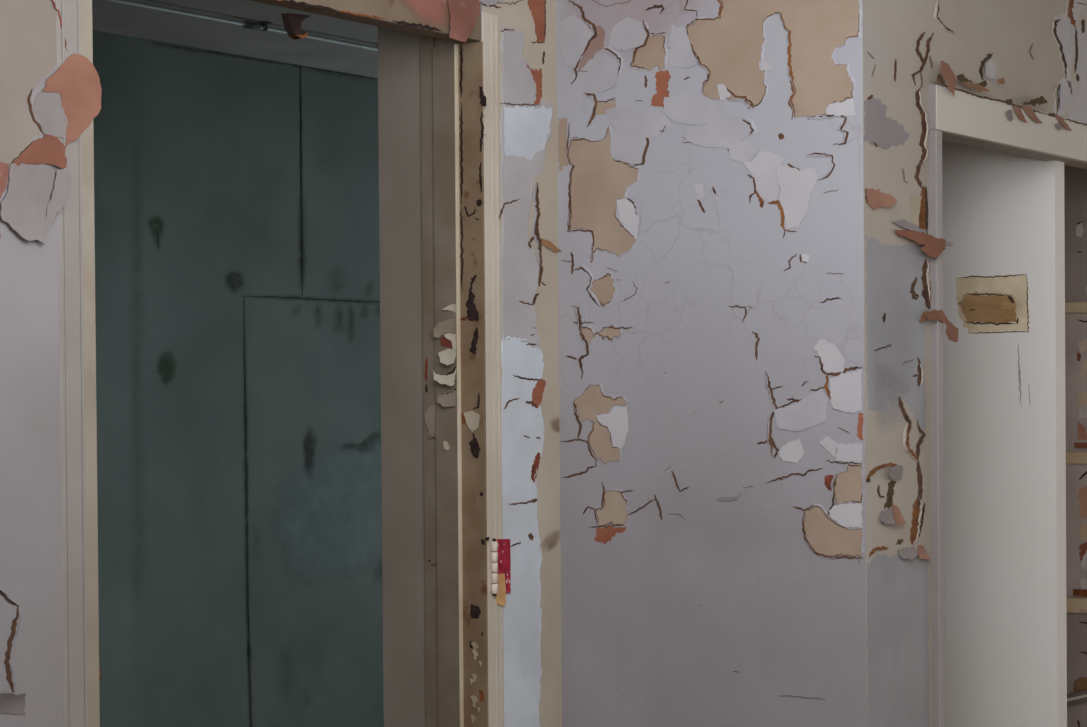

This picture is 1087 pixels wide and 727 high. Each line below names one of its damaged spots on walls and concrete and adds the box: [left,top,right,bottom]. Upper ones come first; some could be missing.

peeling [0,0,68,170]
peeling [609,17,671,108]
crack [560,0,758,151]
peeling [685,0,862,120]
peeling [1006,0,1087,130]
water stain [228,65,382,727]
peeling [424,319,457,450]
peeling [495,0,649,727]
crack [567,267,638,379]
peeling [857,219,931,449]
peeling [956,274,1030,334]
peeling [793,462,930,727]